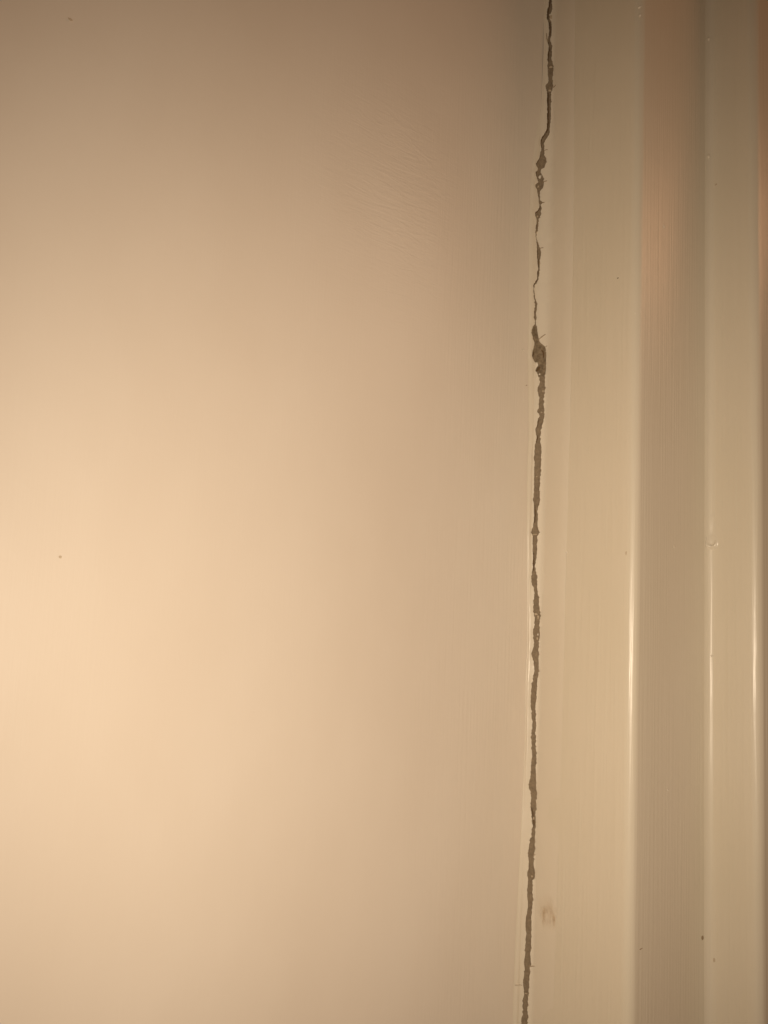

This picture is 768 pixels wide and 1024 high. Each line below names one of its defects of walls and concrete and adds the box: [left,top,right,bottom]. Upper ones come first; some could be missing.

crack [521,0,556,1024]